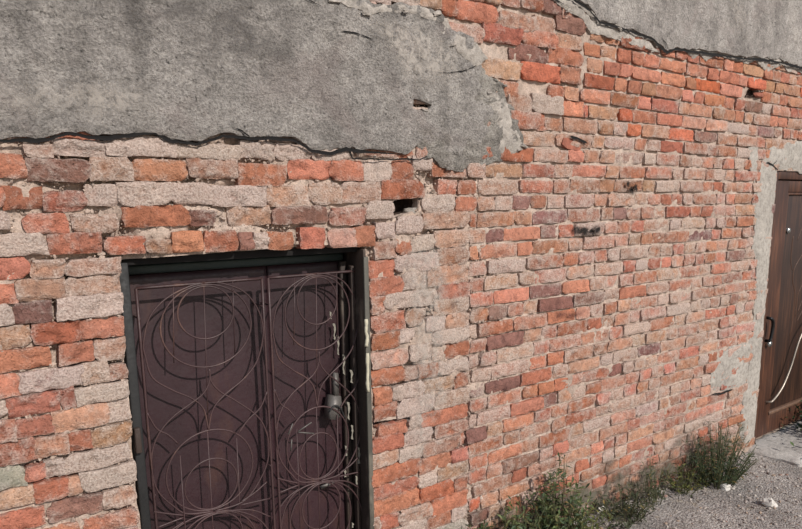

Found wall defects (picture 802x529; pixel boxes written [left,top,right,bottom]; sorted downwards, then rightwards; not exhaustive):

peeling [554,0,660,53]
crack [556,0,802,69]
peeling [328,0,528,172]
peeling [688,49,802,75]
spalling [745,89,764,98]
crack [0,128,435,161]
spalling [561,136,587,151]
hole [393,198,420,217]
peeling [329,311,353,383]
peeling [345,402,360,464]